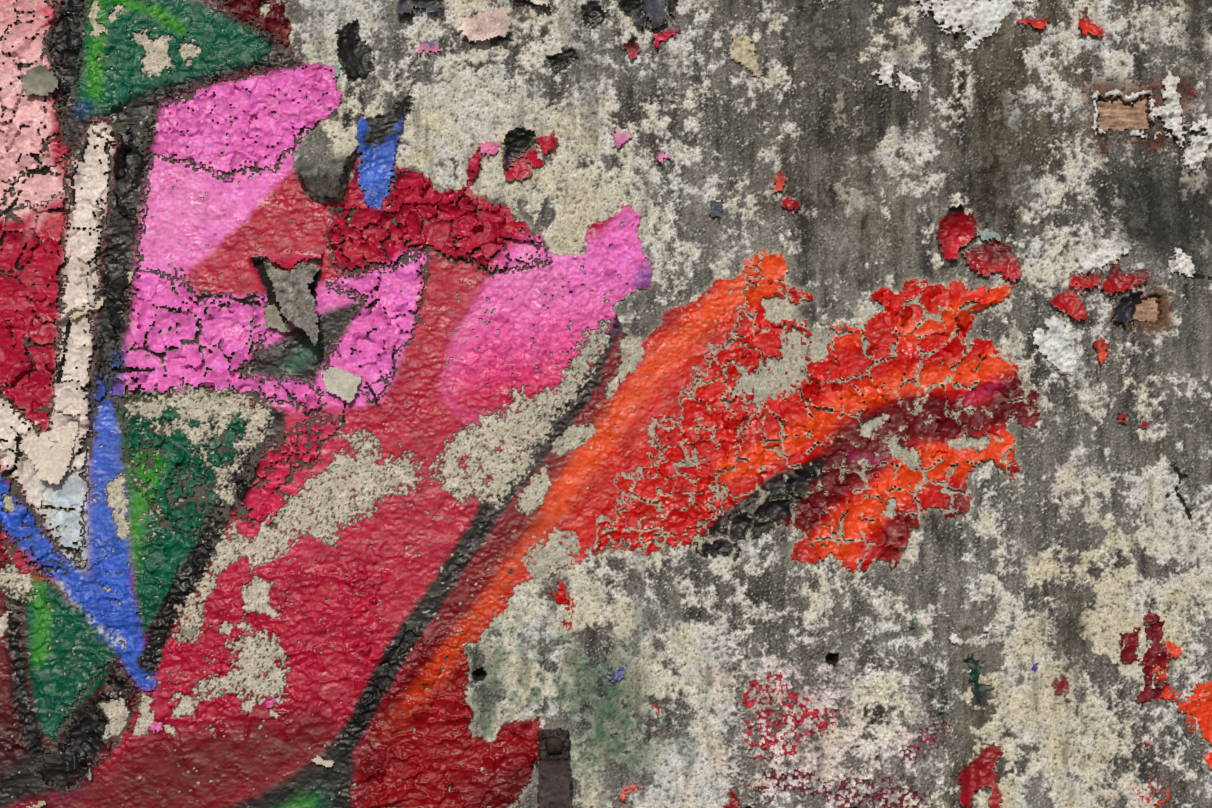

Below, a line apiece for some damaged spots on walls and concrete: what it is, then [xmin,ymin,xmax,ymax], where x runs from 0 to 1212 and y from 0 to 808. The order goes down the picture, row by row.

peeling [581,0,681,60]
crack [0,141,90,273]
spalling [1050,164,1212,325]
crack [57,321,72,384]
peeling [0,0,646,789]
peeling [524,203,1041,629]
crack [1165,463,1192,520]
peeling [1118,601,1212,769]
peeling [958,742,1004,808]